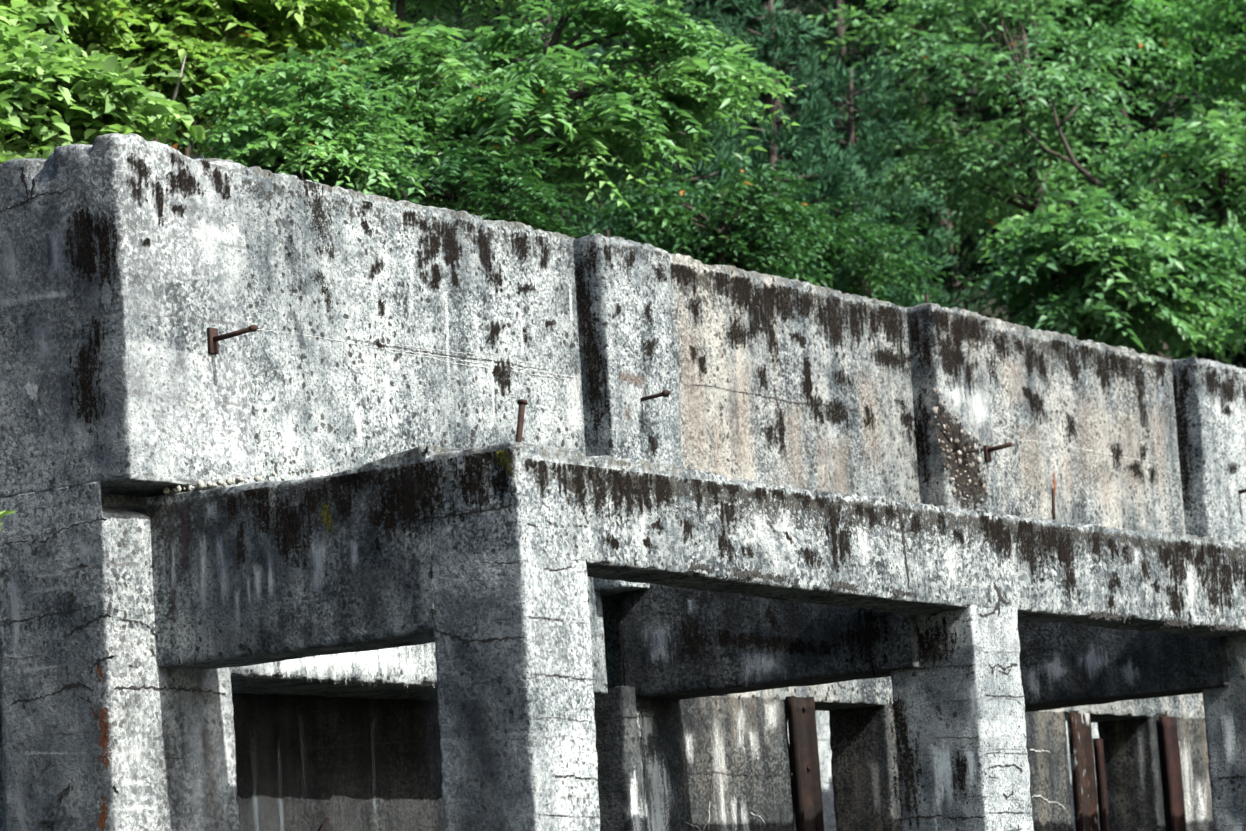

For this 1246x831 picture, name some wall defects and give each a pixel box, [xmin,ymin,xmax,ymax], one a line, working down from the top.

damp [2,204,122,346]
damp [403,210,475,291]
damp [490,263,536,294]
damp [512,232,549,269]
spalling [928,387,992,511]
damp [1088,531,1246,625]
rust [92,704,114,770]
rust [97,797,108,831]
damp [631,760,668,831]